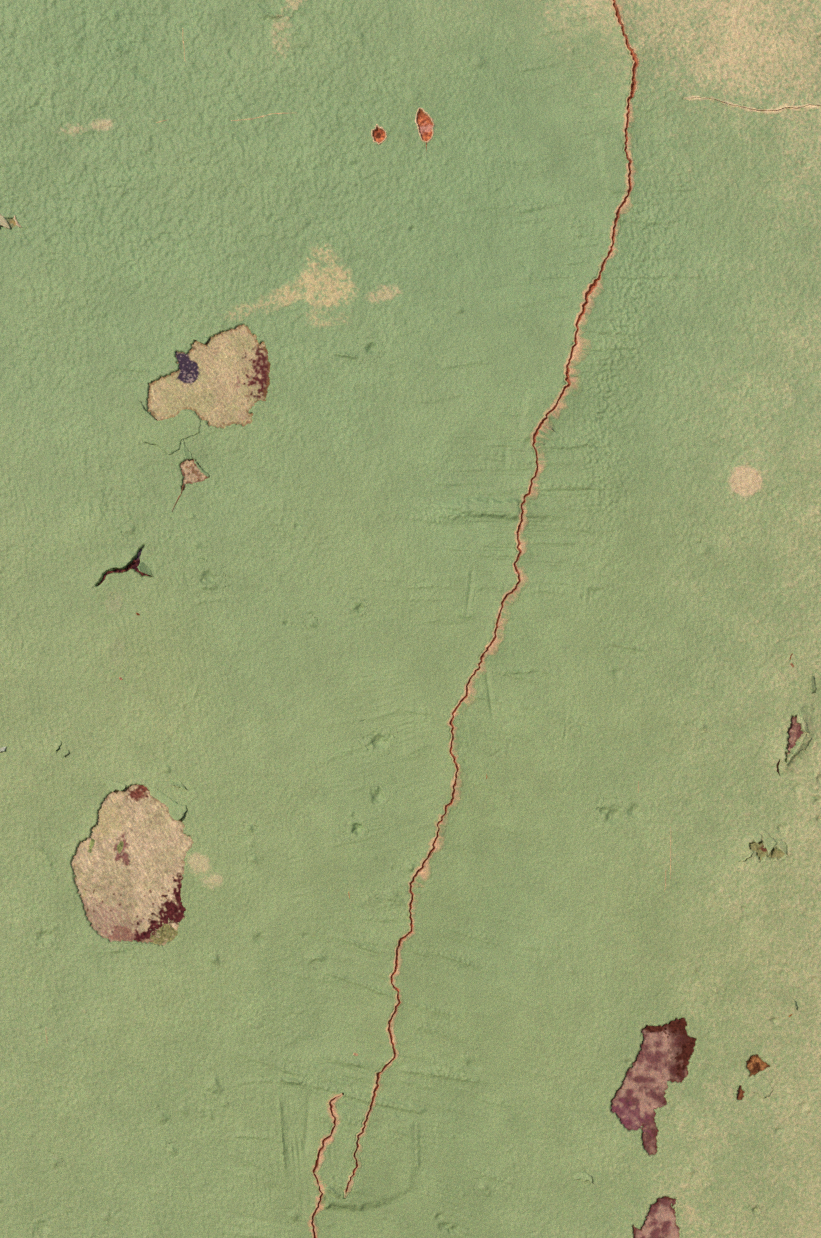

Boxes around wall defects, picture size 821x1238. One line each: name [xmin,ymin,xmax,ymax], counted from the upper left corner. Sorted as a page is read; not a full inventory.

spalling [371,124,387,145]
hole [415,108,435,151]
crack [683,95,821,115]
peeling [137,324,271,512]
crack [307,0,641,1238]
peeling [776,711,811,776]
peeling [71,778,194,946]
peeling [611,1018,696,1155]
peeling [737,1054,773,1100]
peeling [633,1196,680,1238]